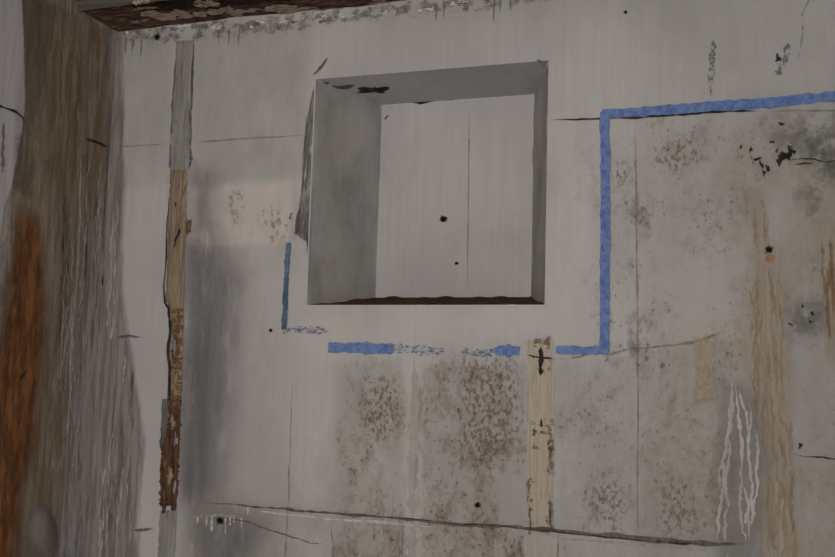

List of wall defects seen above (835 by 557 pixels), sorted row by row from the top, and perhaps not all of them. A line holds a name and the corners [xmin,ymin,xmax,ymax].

corrosion [110,0,409,22]
flaking render [117,0,472,41]
crack [0,105,25,122]
water stain [740,141,811,175]
crack [780,156,835,164]
corrosion [0,216,45,557]
water stain [464,367,514,456]
peeling [161,455,176,499]
water stain [716,377,760,542]
crack [796,443,835,459]
crack [213,503,737,550]